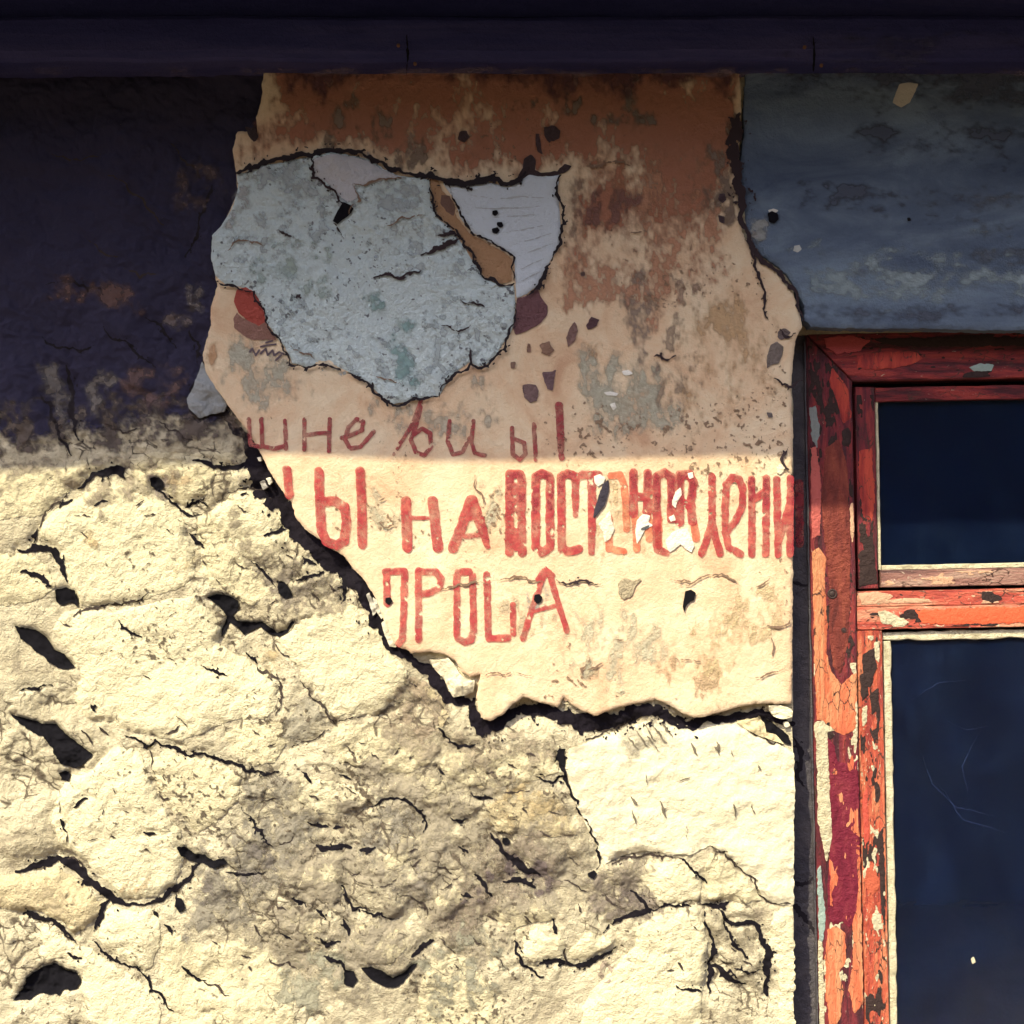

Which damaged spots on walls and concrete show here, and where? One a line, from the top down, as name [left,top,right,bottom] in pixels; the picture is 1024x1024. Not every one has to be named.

leakage [476,73,732,126]
leakage [571,180,643,237]
crack [725,112,804,339]
peeling [211,125,571,404]
peeling [187,362,227,418]
peeling [593,474,614,542]
peeling [665,472,694,552]
peeling [366,593,397,647]
crack [0,317,814,1024]
peeling [430,657,475,697]
peeling [808,333,1024,1024]
peeling [737,704,793,744]